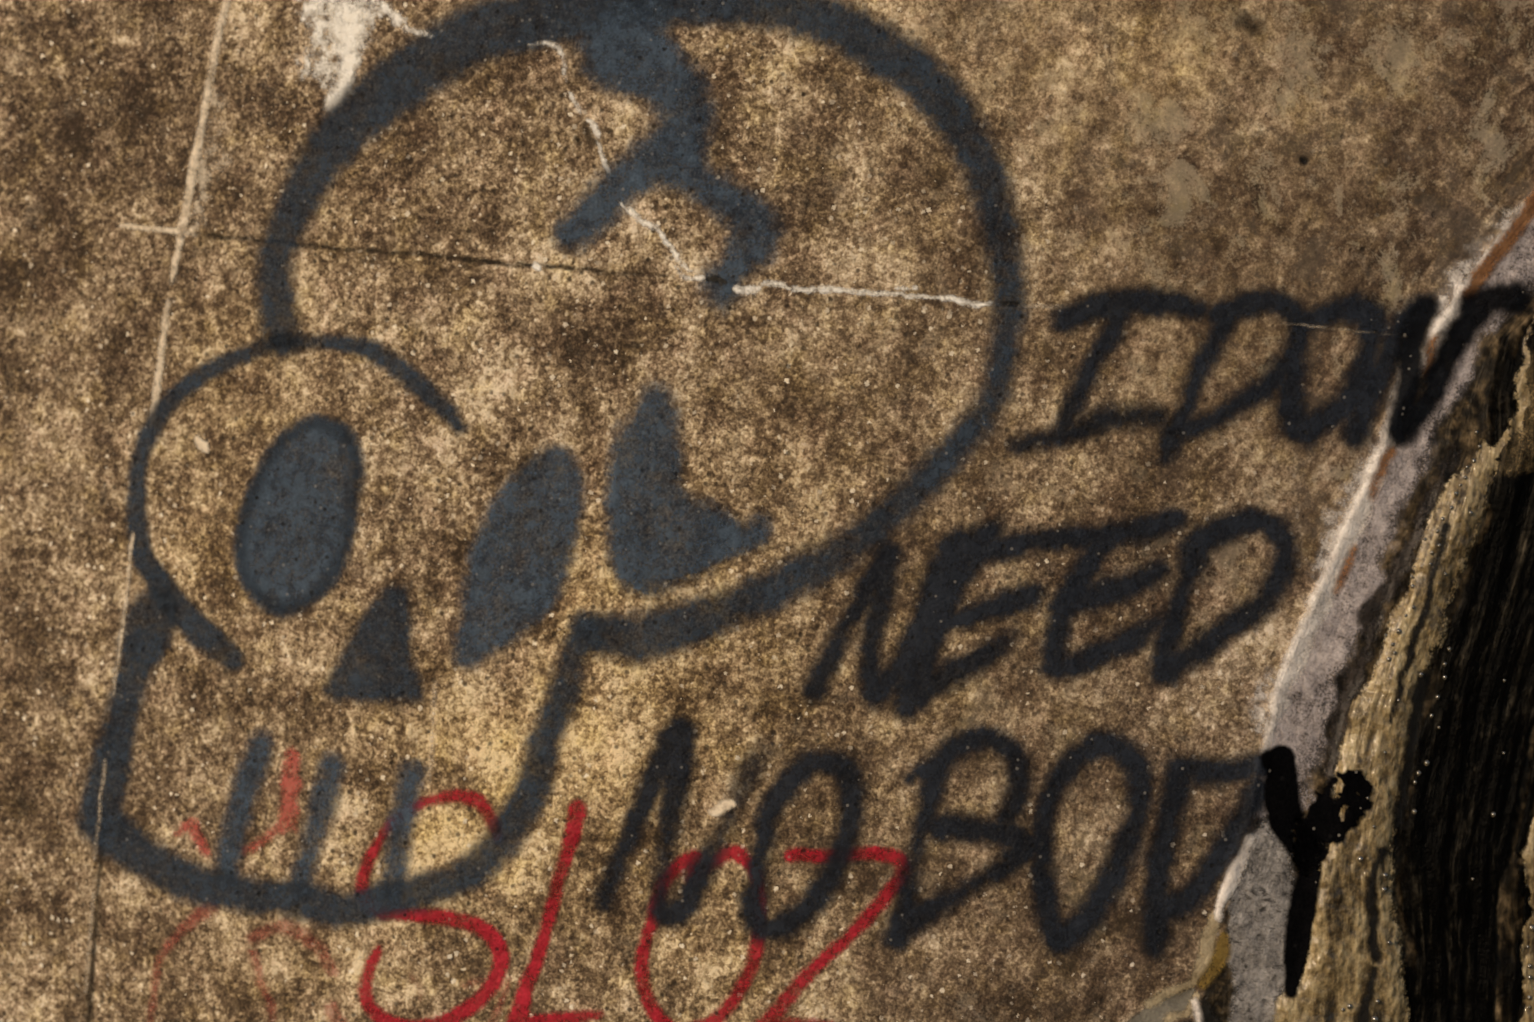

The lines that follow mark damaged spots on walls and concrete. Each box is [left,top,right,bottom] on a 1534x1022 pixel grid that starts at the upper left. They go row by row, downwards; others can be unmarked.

crack [120,224,260,242]
crack [296,41,1037,308]